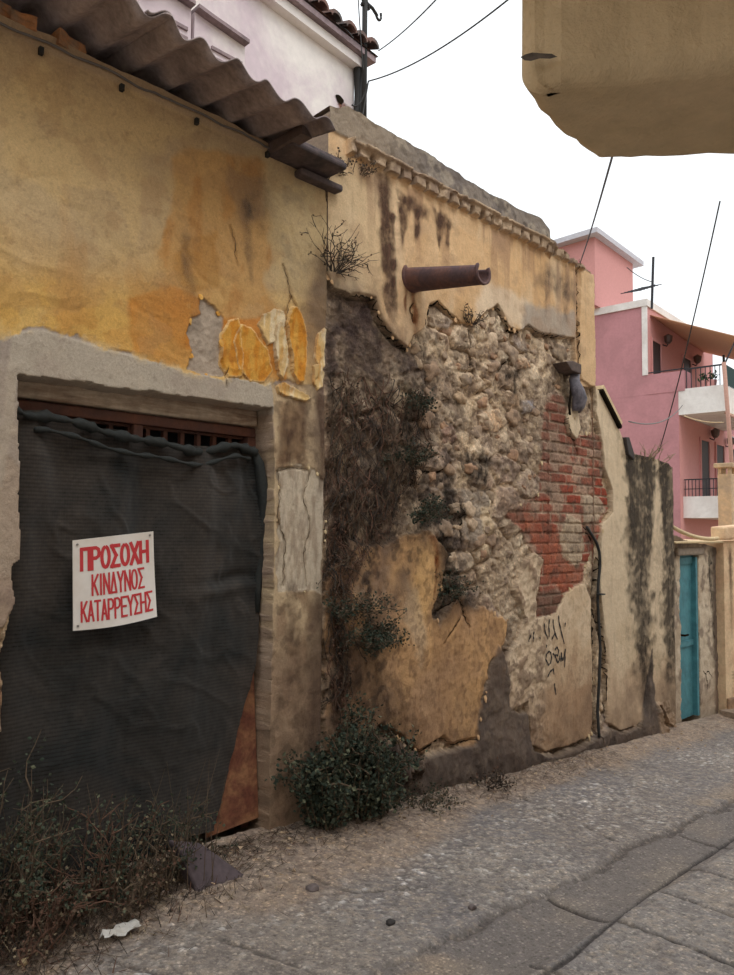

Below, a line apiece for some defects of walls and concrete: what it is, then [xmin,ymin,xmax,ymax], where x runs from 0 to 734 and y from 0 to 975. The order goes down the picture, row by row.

damp [378,176,450,311]
spalling [0,616,9,649]
spalling [186,274,640,773]
damp [626,454,676,682]